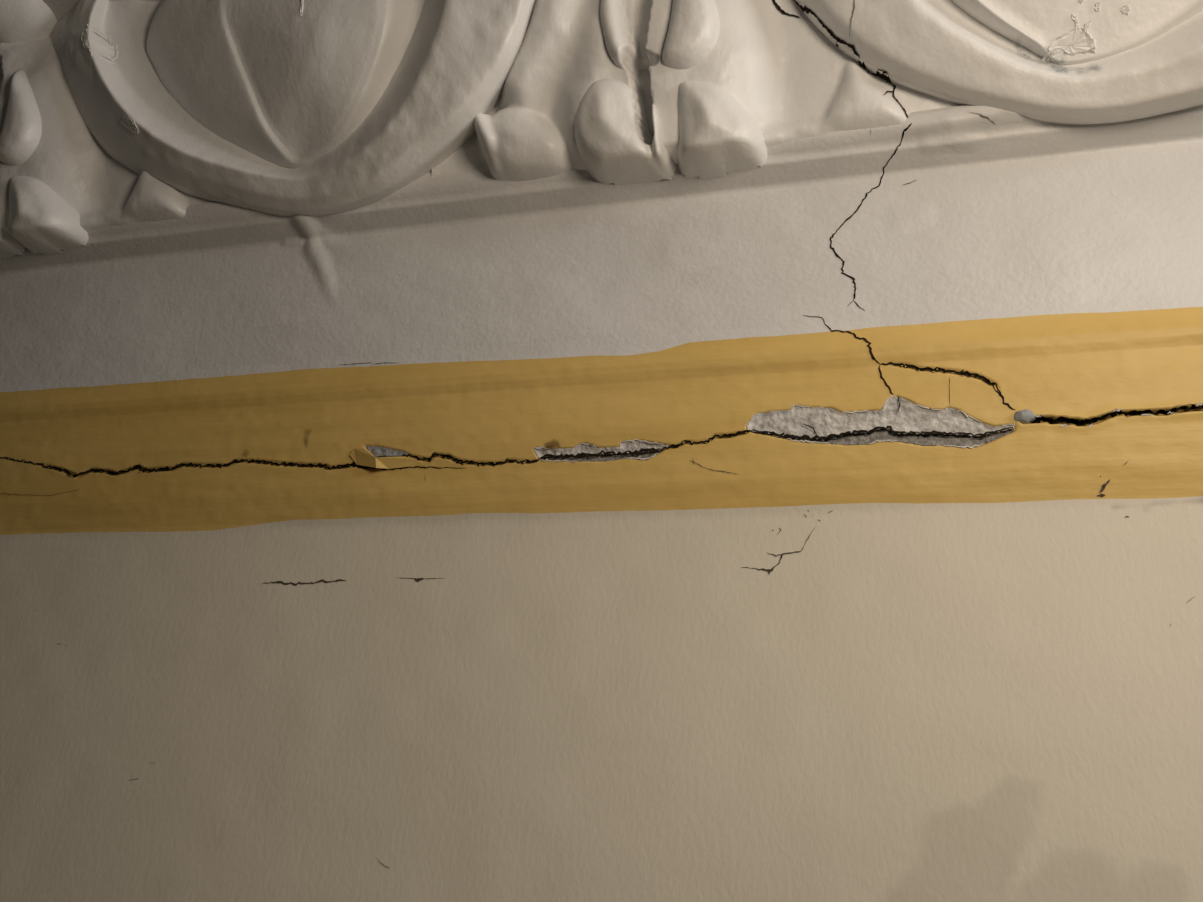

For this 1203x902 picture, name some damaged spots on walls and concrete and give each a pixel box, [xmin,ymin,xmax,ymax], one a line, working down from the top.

peeling [1040,0,1101,71]
crack [773,0,1203,427]
spalling [747,396,1015,448]
crack [0,452,540,496]
spalling [533,439,670,462]
crack [668,430,751,474]